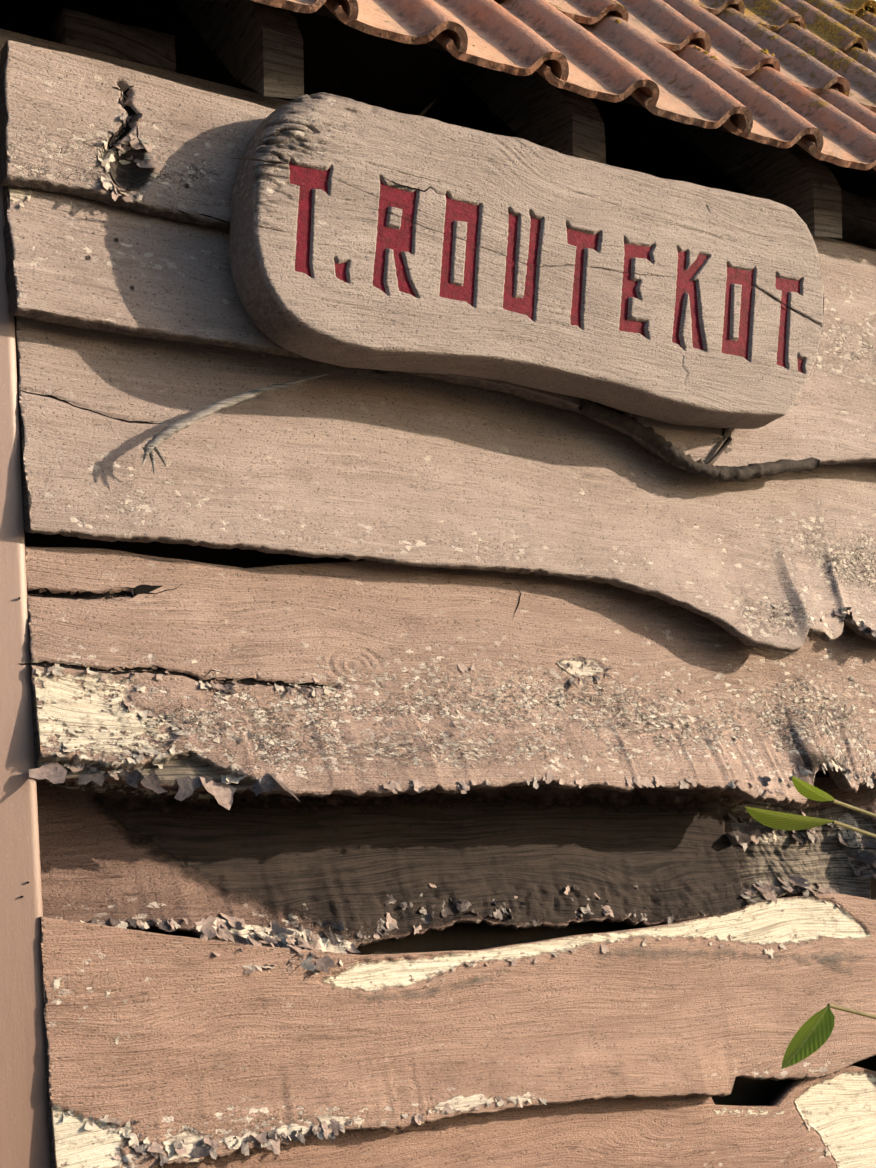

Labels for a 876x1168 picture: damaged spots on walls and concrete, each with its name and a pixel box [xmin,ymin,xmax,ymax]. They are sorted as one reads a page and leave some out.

crack [107,85,143,159]
crack [21,389,161,431]
peeling [29,656,876,991]
peeling [53,1105,351,1168]
peeling [402,1092,547,1125]
peeling [714,1108,784,1117]
peeling [795,1072,876,1168]